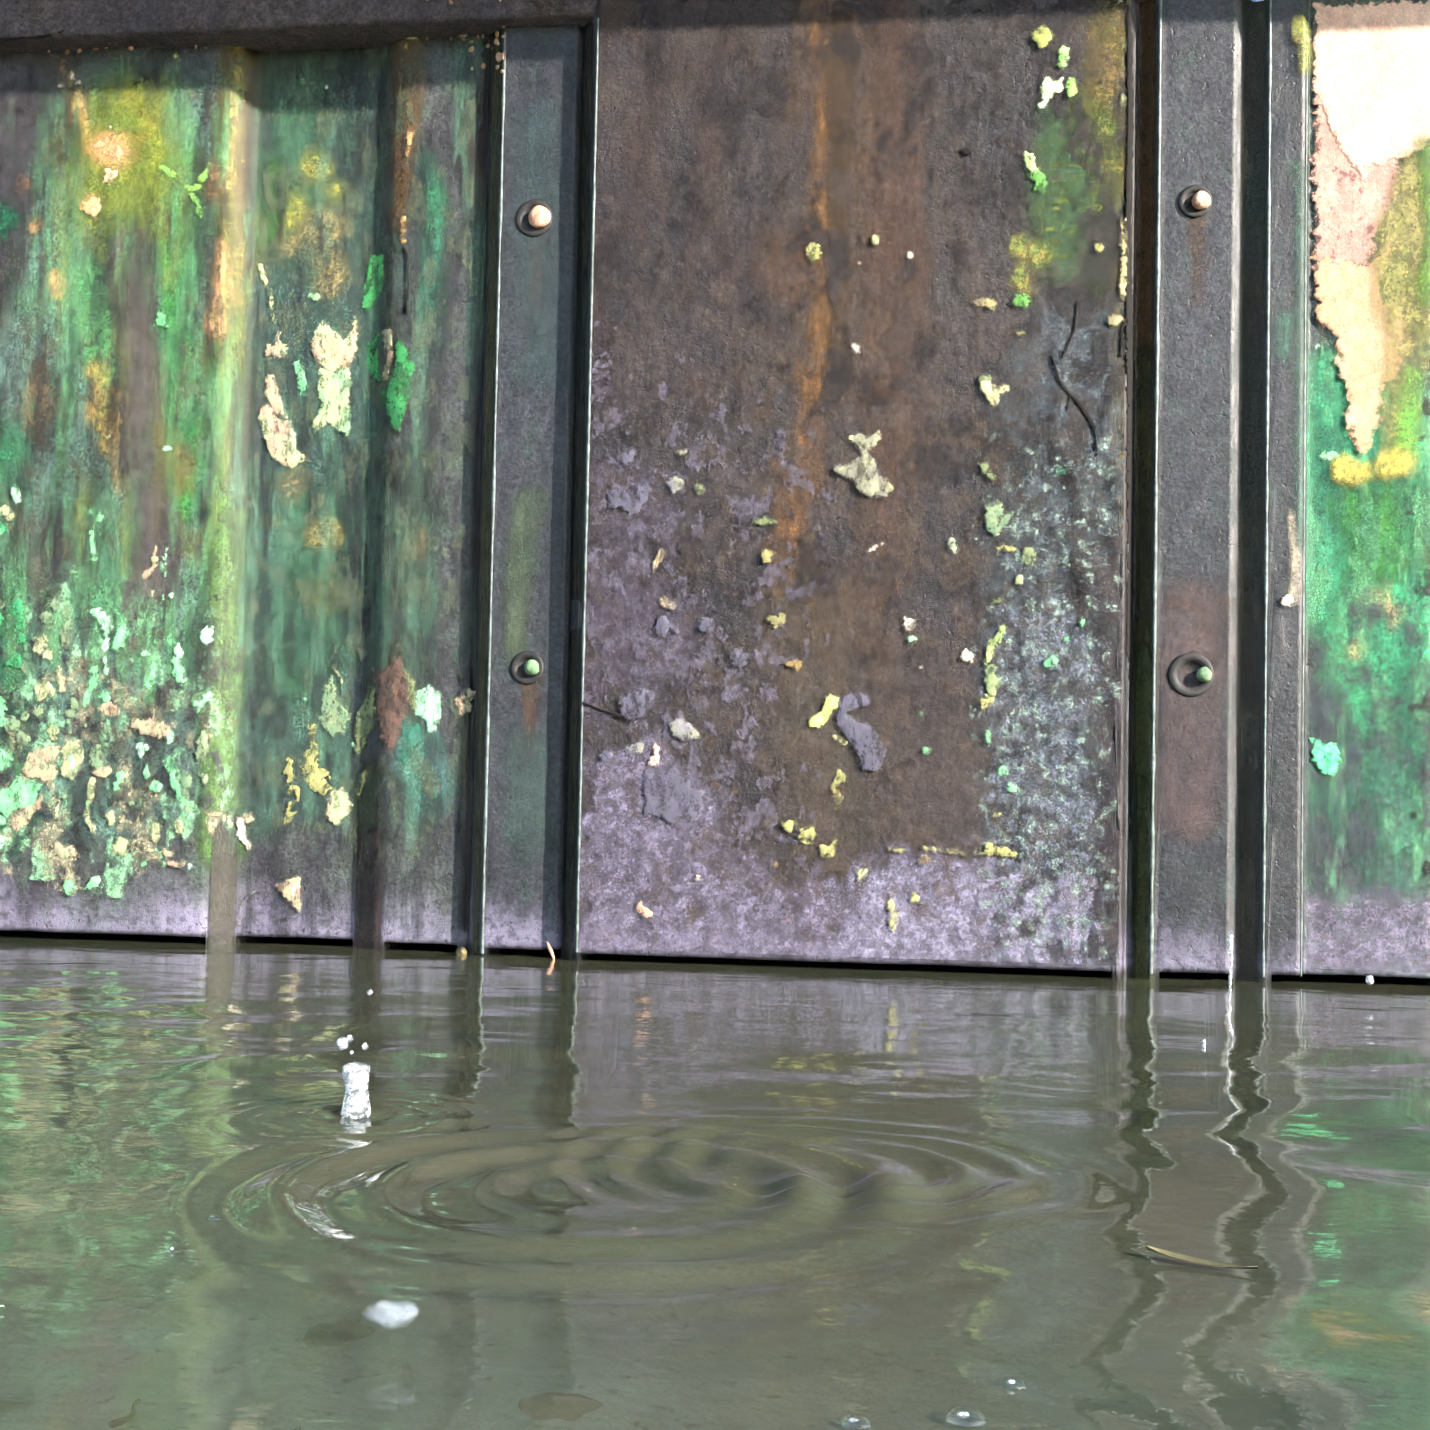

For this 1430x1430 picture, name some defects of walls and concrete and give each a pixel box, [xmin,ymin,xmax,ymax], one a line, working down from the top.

peeling [0,596,209,869]
water stain [0,45,378,945]
peeling [257,255,416,468]
corrosion [353,760,384,951]
corrosion [388,38,421,230]
corrosion [562,0,1156,983]
peeling [833,429,893,498]
crack [1051,5,1135,835]
corrosion [1239,0,1267,982]
water stain [1293,18,1310,70]
water stain [1276,138,1430,972]
peeling [1297,0,1430,453]